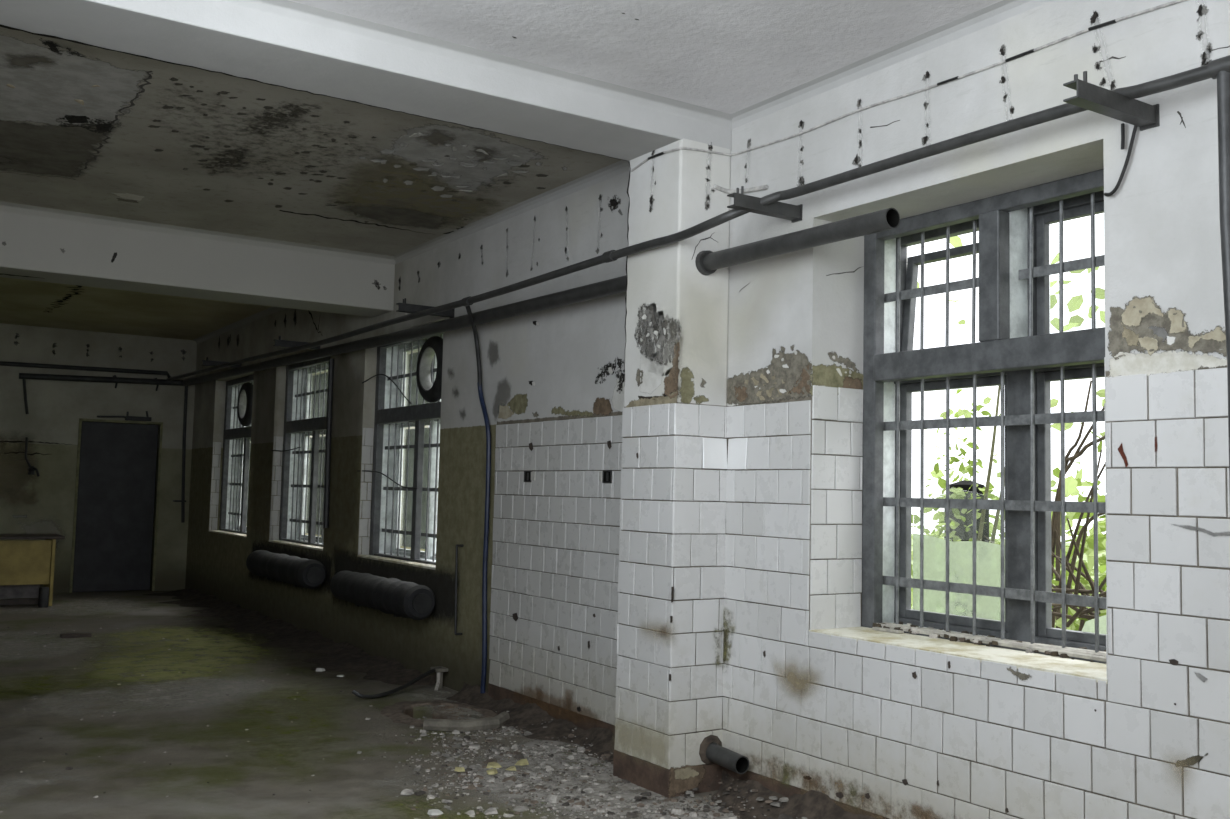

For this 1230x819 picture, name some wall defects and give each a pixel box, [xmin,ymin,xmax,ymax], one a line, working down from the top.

water stain [201,103,315,173]
crack [0,24,630,387]
peeling [498,304,709,419]
flaking render [727,345,863,406]
flaking render [1107,295,1227,378]
water stain [715,611,734,670]